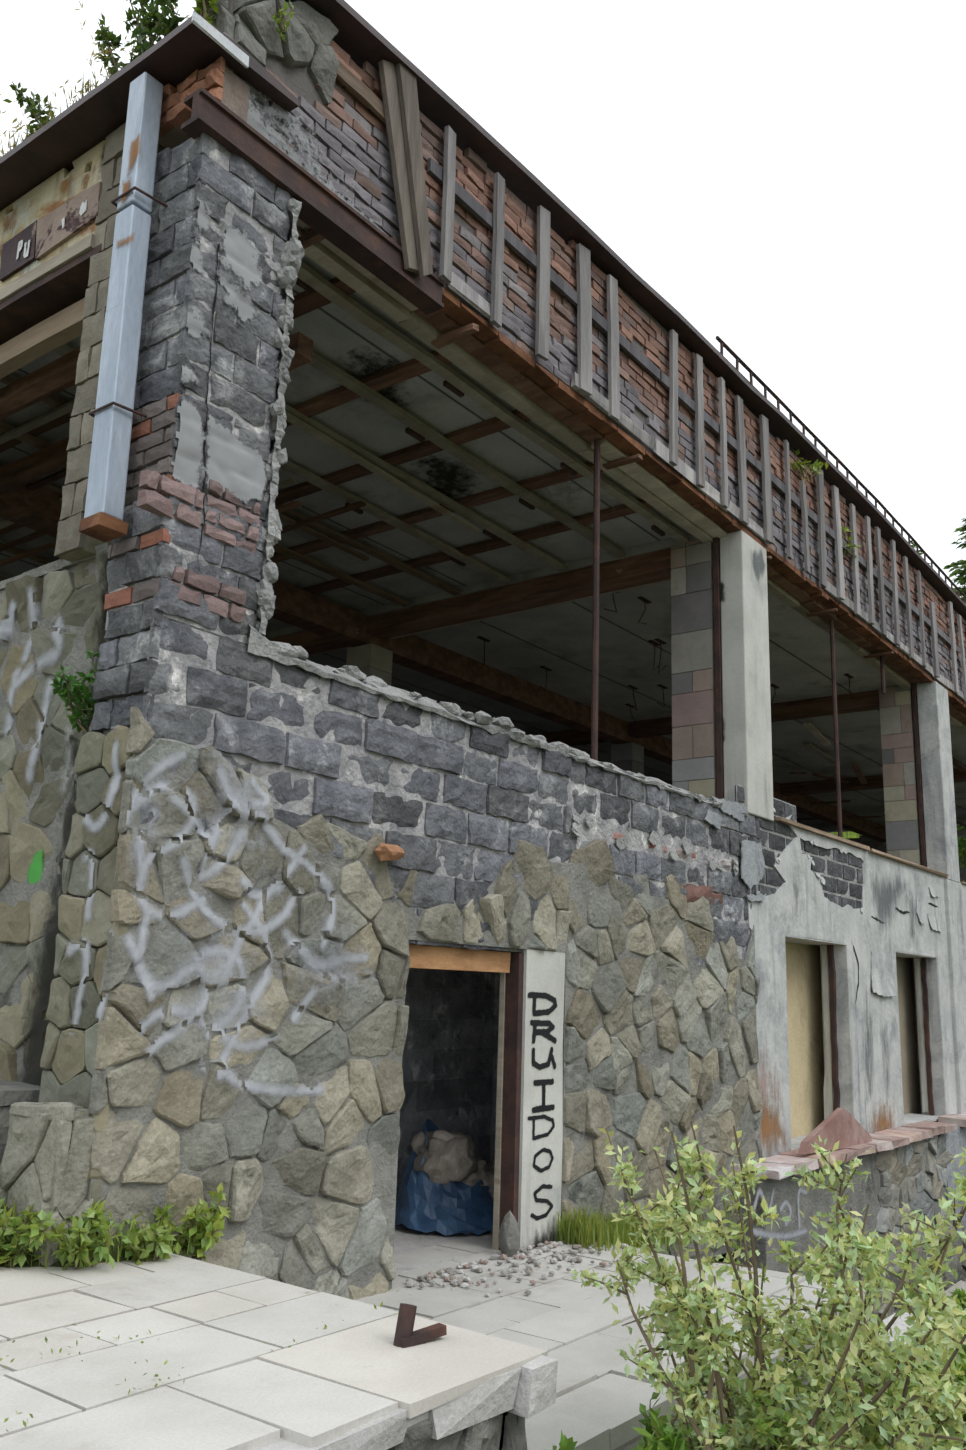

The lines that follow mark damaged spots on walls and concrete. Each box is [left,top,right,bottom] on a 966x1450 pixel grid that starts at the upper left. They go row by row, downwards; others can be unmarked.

spalling [137,196,305,636]
spalling [571,784,864,913]
corrosion [759,1103,785,1144]